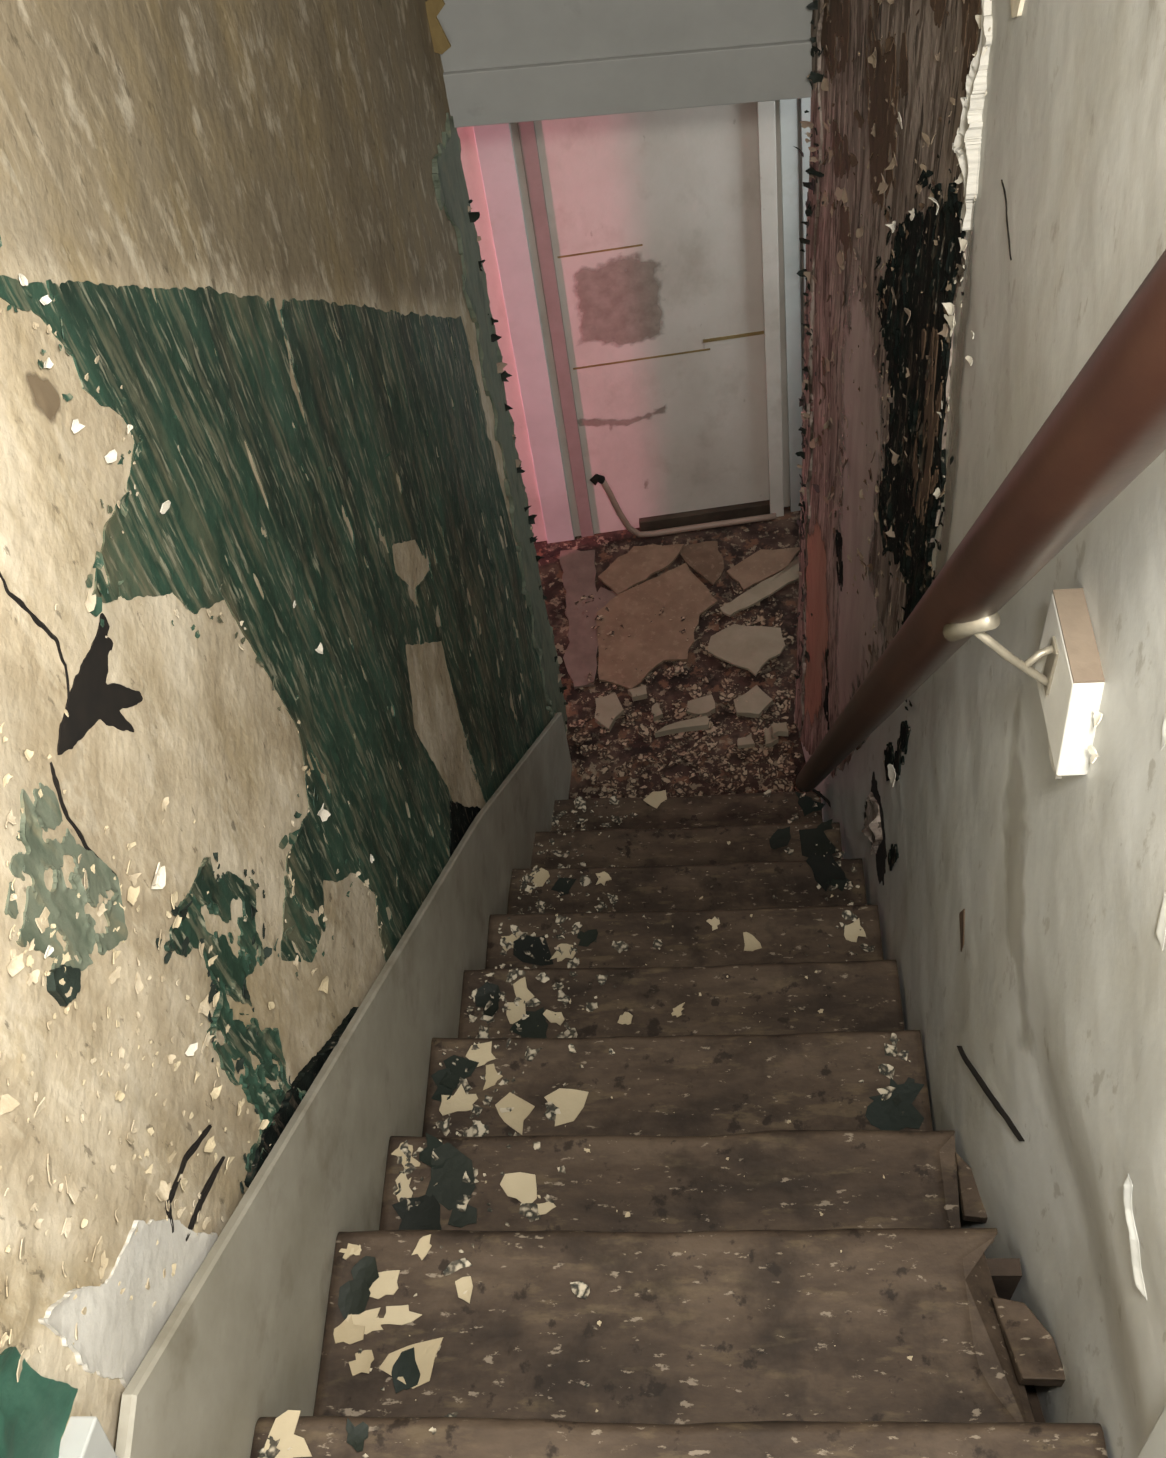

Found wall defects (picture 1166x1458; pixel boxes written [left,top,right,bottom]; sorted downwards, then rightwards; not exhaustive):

peeling [425,0,451,54]
damp [575,254,662,345]
flaking render [791,0,992,755]
damp [933,199,975,581]
crack [0,572,143,876]
peeling [0,113,569,1458]
spalling [862,699,912,885]
peeling [393,795,638,1210]
crack [957,1046,1025,1141]
peeling [570,1281,590,1299]